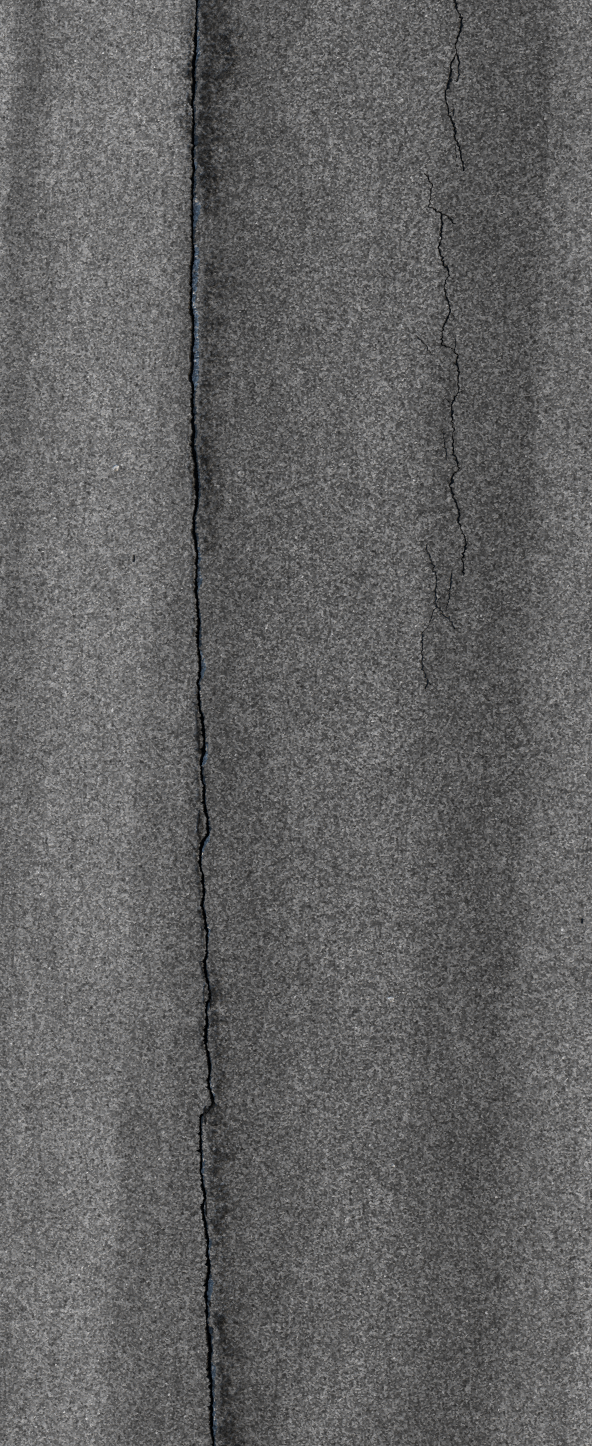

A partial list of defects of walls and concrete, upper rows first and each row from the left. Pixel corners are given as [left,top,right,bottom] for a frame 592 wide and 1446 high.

crack [188,0,217,1446]
crack [416,0,467,692]